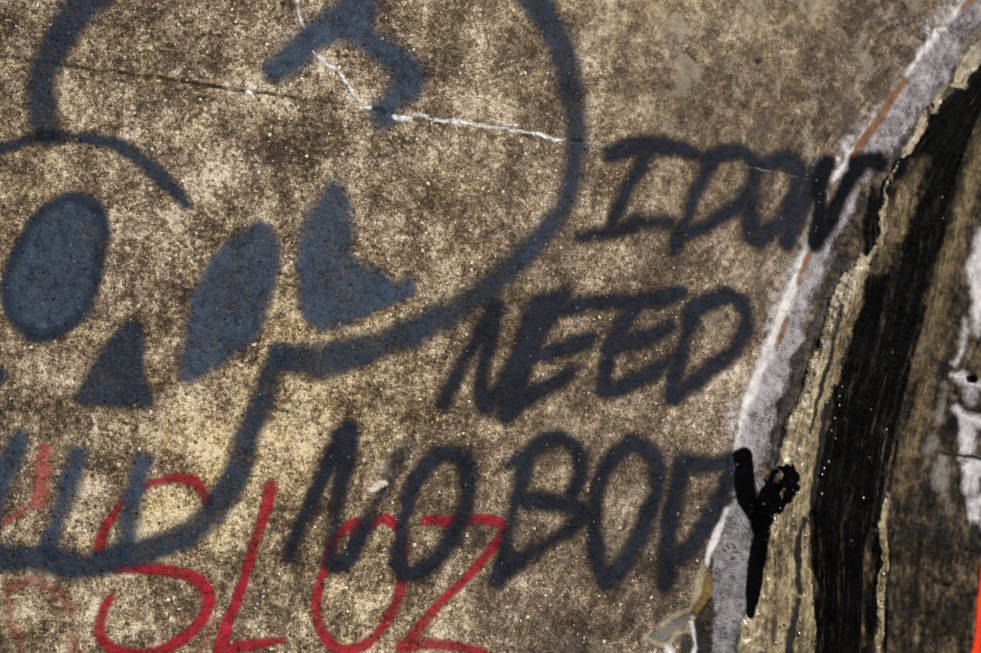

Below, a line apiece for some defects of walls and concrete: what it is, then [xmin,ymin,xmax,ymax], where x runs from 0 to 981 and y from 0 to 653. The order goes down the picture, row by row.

crack [280,0,305,29]
crack [61,51,599,145]